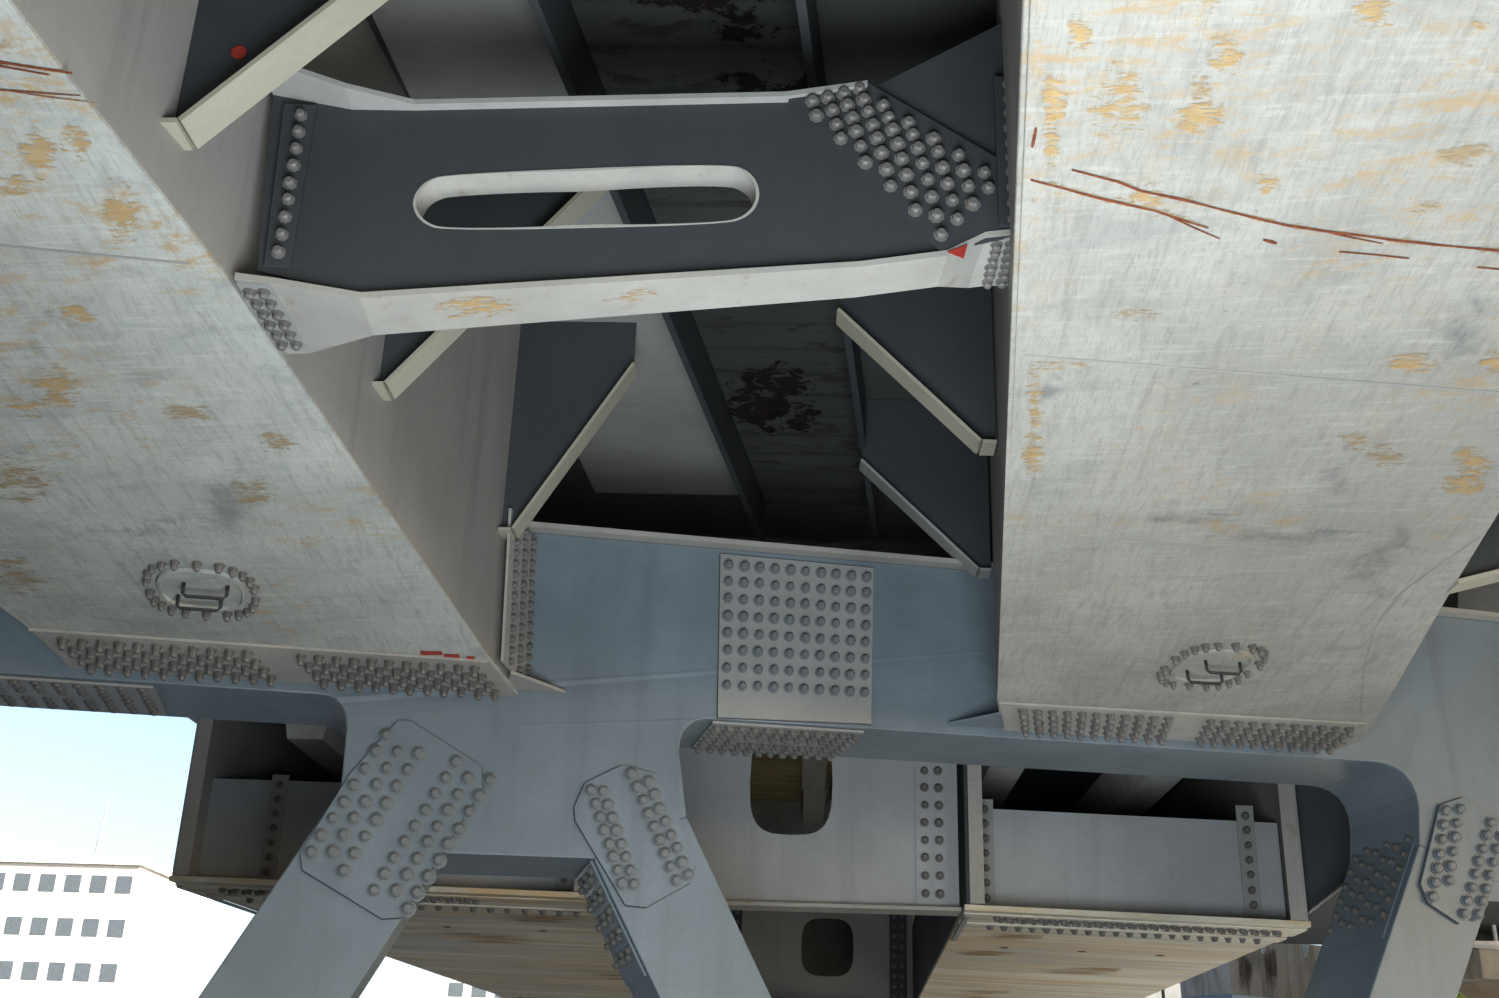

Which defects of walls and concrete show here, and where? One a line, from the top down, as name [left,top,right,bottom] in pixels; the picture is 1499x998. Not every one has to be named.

rust [1068,21,1092,51]
rust [1353,0,1391,28]
rust [0,43,94,103]
rust [1090,62,1150,131]
rust [1176,37,1244,134]
rust [0,126,91,195]
rust [1030,76,1499,270]
rust [103,182,140,241]
rust [53,306,95,326]
rust [7,367,77,418]
rust [167,406,209,420]
rust [1443,447,1493,495]